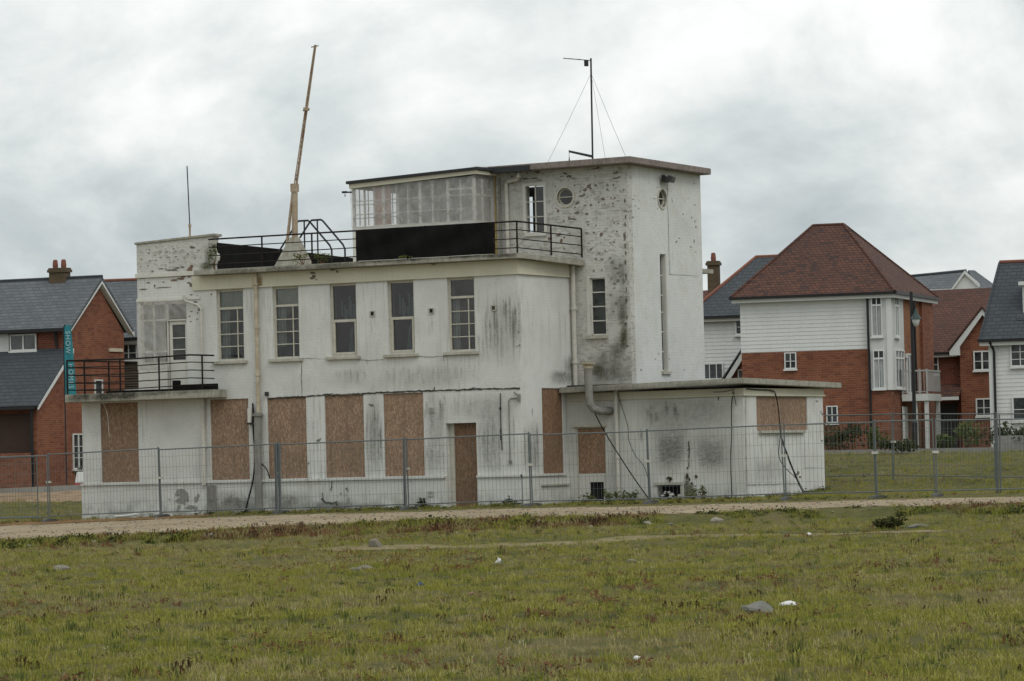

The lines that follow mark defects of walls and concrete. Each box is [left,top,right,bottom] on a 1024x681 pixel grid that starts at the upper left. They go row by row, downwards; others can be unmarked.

flaking render [140,246,200,322]
peeling [548,167,639,325]